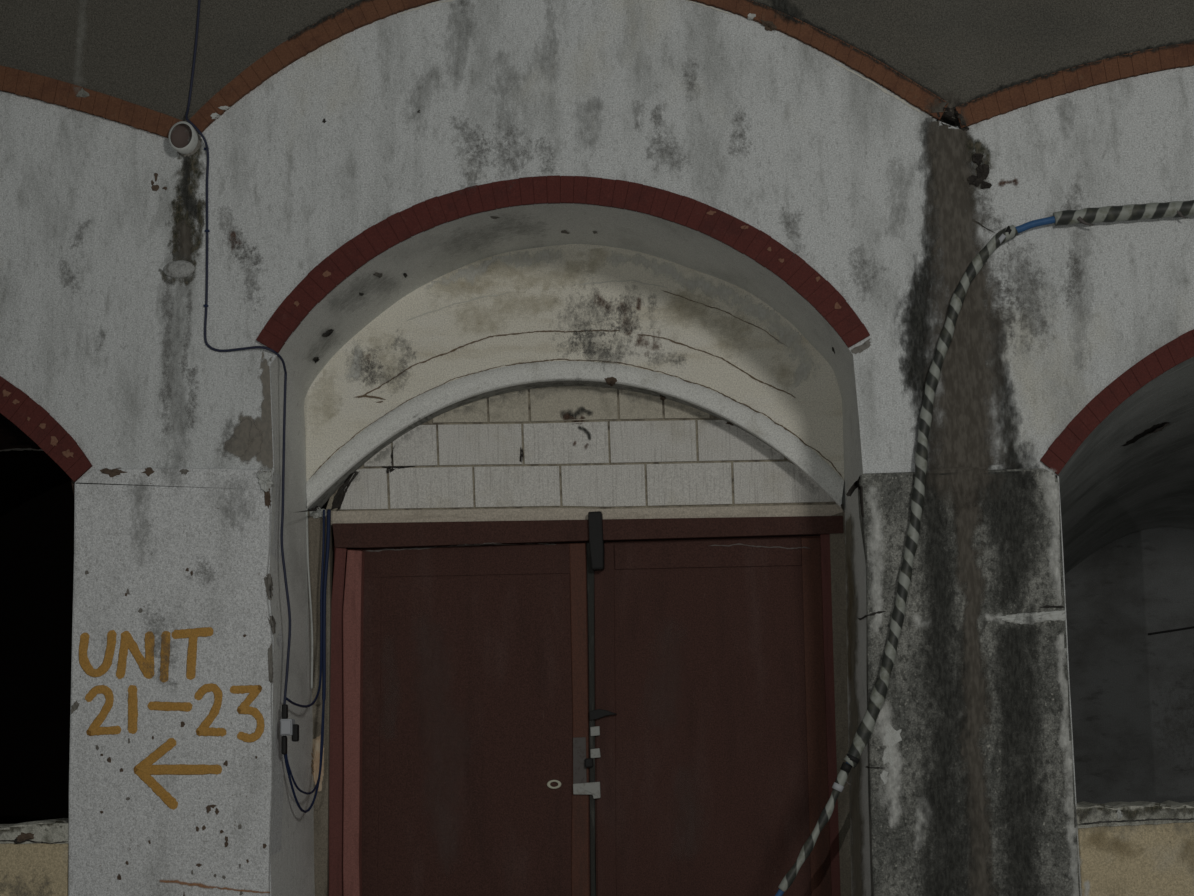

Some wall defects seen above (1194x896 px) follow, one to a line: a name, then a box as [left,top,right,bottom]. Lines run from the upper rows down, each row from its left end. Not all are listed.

leakage [159,148,205,285]
crack [662,290,785,345]
crack [309,329,843,479]
leakage [748,0,1194,896]